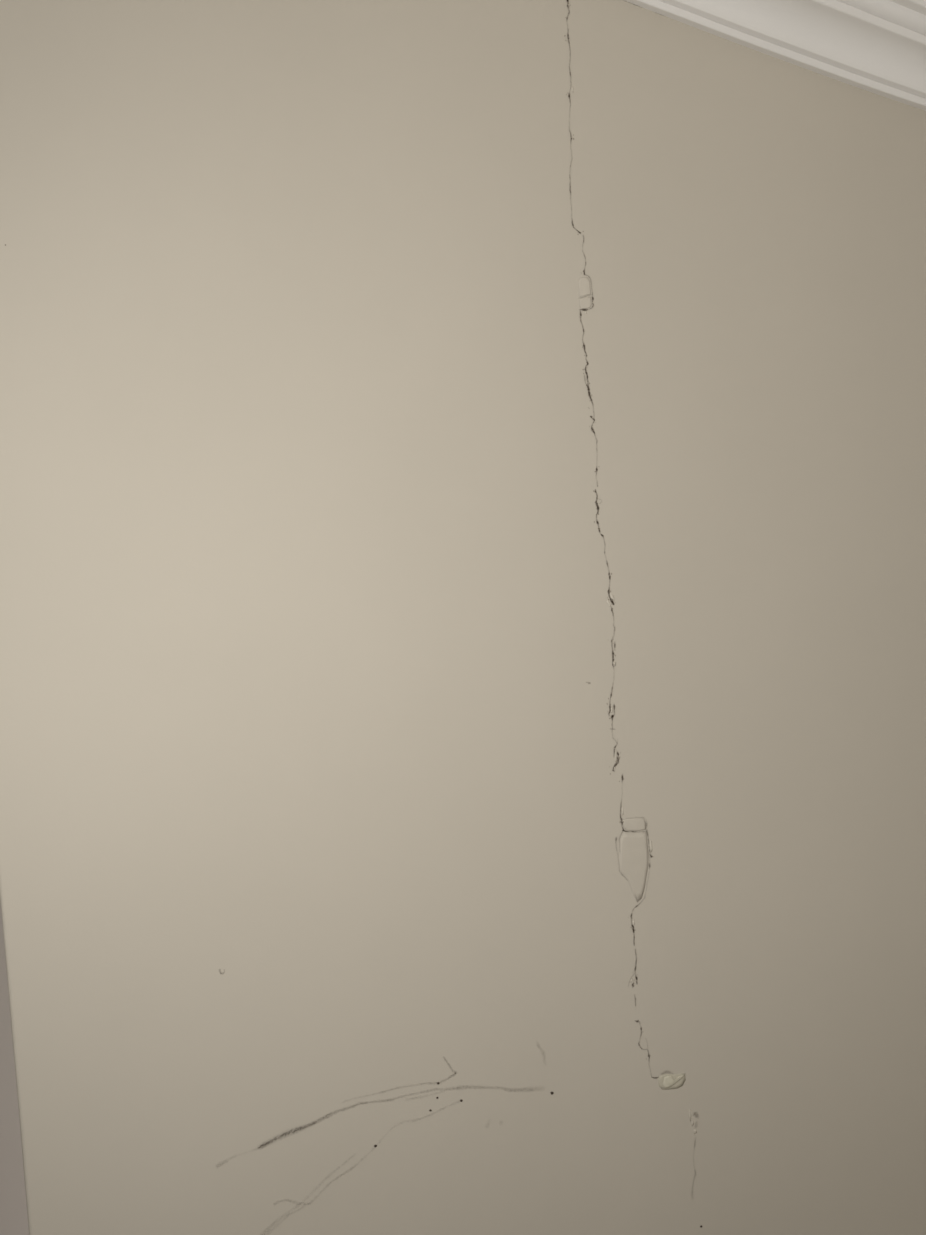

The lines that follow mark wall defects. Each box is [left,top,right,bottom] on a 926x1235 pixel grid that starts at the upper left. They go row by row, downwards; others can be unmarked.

crack [580,271,595,433]
crack [606,573,653,866]